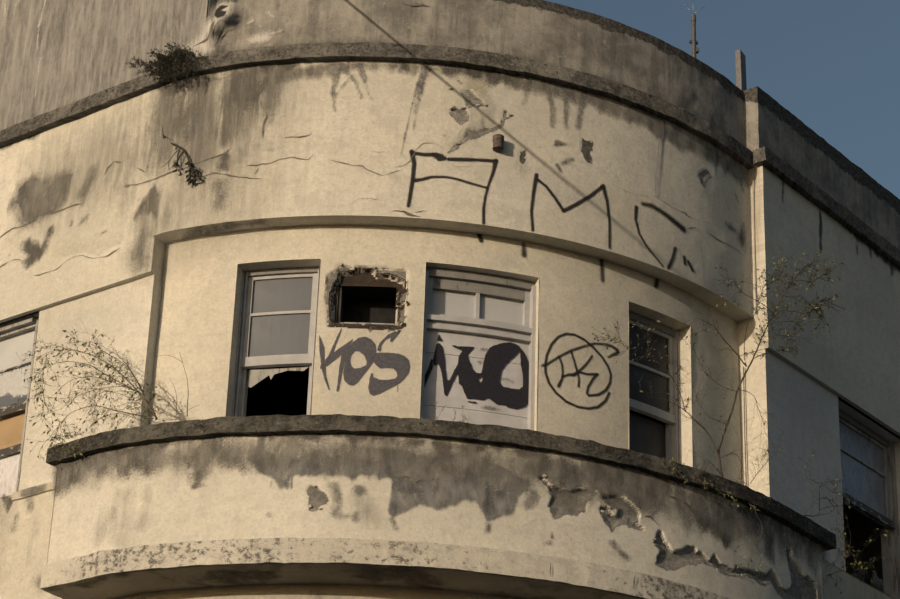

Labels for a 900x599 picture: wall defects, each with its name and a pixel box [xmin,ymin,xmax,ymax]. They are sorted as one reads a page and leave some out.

crack [101,101,492,186]
peeling [448,80,513,154]
peeling [11,171,73,225]
crack [0,202,119,276]
water stain [79,167,97,199]
crack [349,198,424,217]
water stain [21,486,43,496]
peeling [251,435,644,558]
flaking render [653,532,817,599]